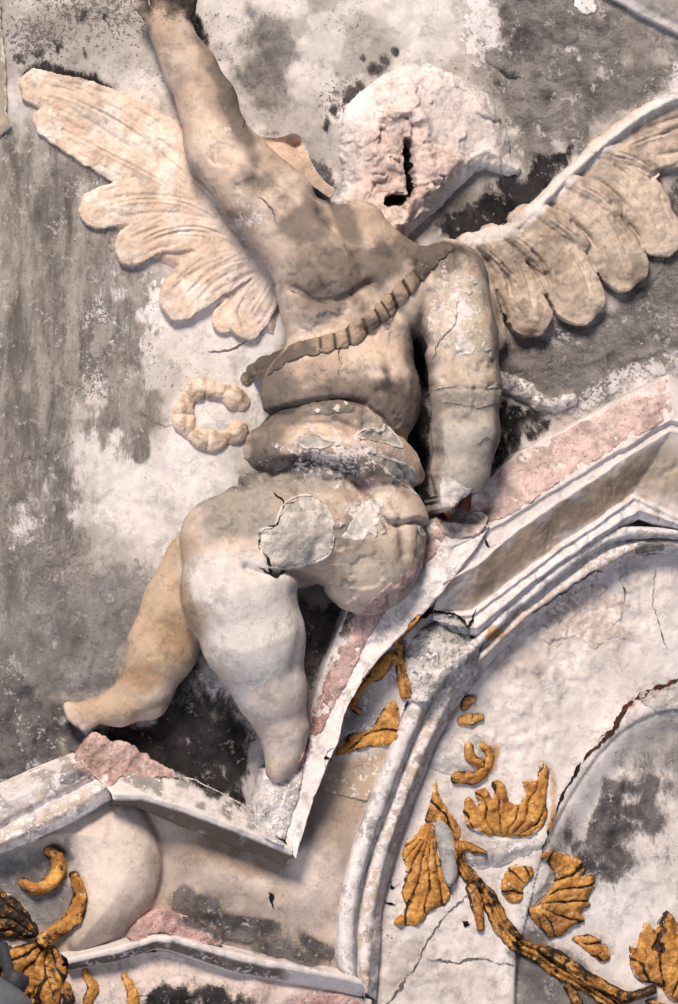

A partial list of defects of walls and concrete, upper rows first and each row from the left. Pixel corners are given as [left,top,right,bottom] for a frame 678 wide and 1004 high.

peeling [574,0,607,17]
water stain [13,50,42,64]
water stain [230,6,299,108]
crack [258,491,299,578]
peeling [259,494,393,571]
spalling [291,378,672,776]
crack [532,570,626,614]
crack [652,569,668,650]
spalling [74,732,178,787]
water stain [586,778,625,849]
crack [542,678,678,853]
water stain [639,775,660,819]